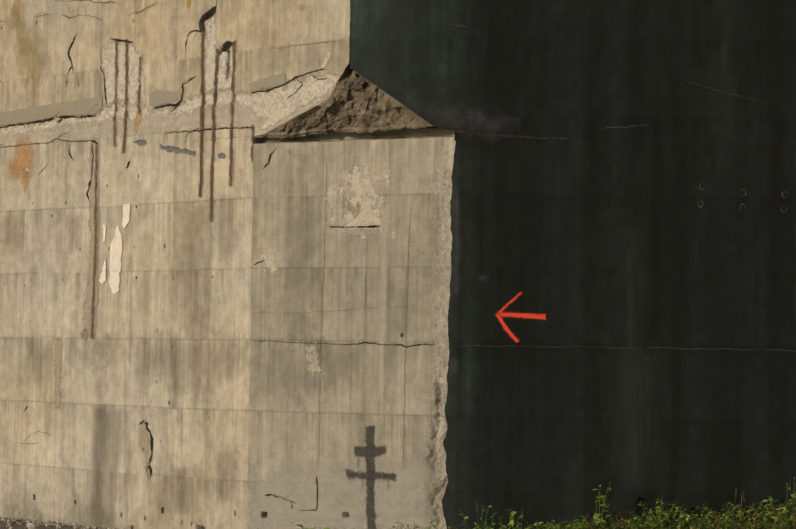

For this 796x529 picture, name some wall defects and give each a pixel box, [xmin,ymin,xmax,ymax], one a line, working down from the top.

crack [0,51,108,202]
crack [66,37,79,86]
crack [36,0,158,20]
spalling [0,6,339,221]
spalling [80,141,137,339]
crack [252,225,436,468]
spalling [423,177,451,528]
crack [140,420,153,477]
crack [265,398,320,511]